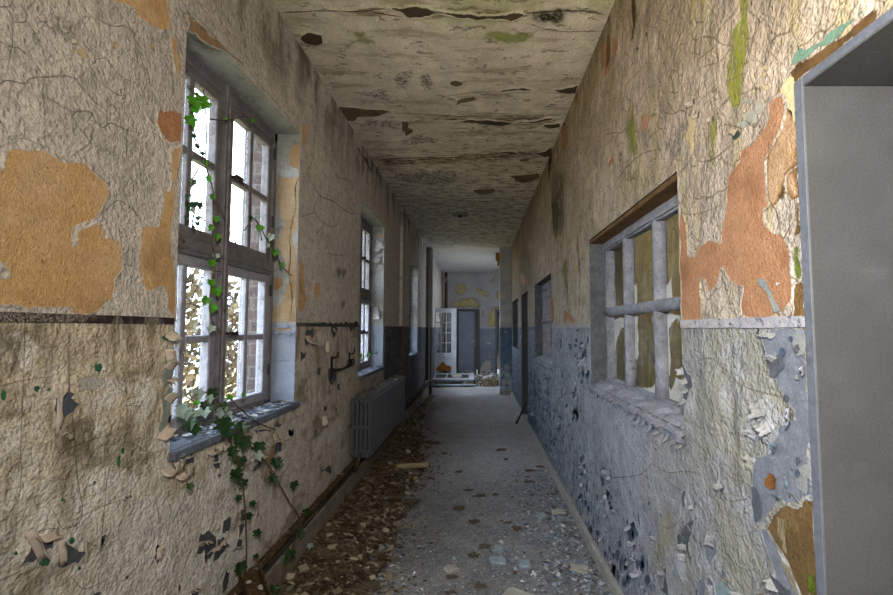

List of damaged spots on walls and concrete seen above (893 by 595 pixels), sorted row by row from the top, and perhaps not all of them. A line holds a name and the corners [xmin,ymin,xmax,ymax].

spalling [0,144,125,315]
crack [0,2,156,219]
spalling [136,104,186,441]
spalling [297,30,326,48]
spalling [338,92,437,145]
spalling [386,4,527,23]
crack [609,0,769,238]
spalling [675,61,804,320]
crack [1,376,70,555]
peeling [51,375,105,440]
peeling [194,508,245,566]
peeling [742,328,817,595]